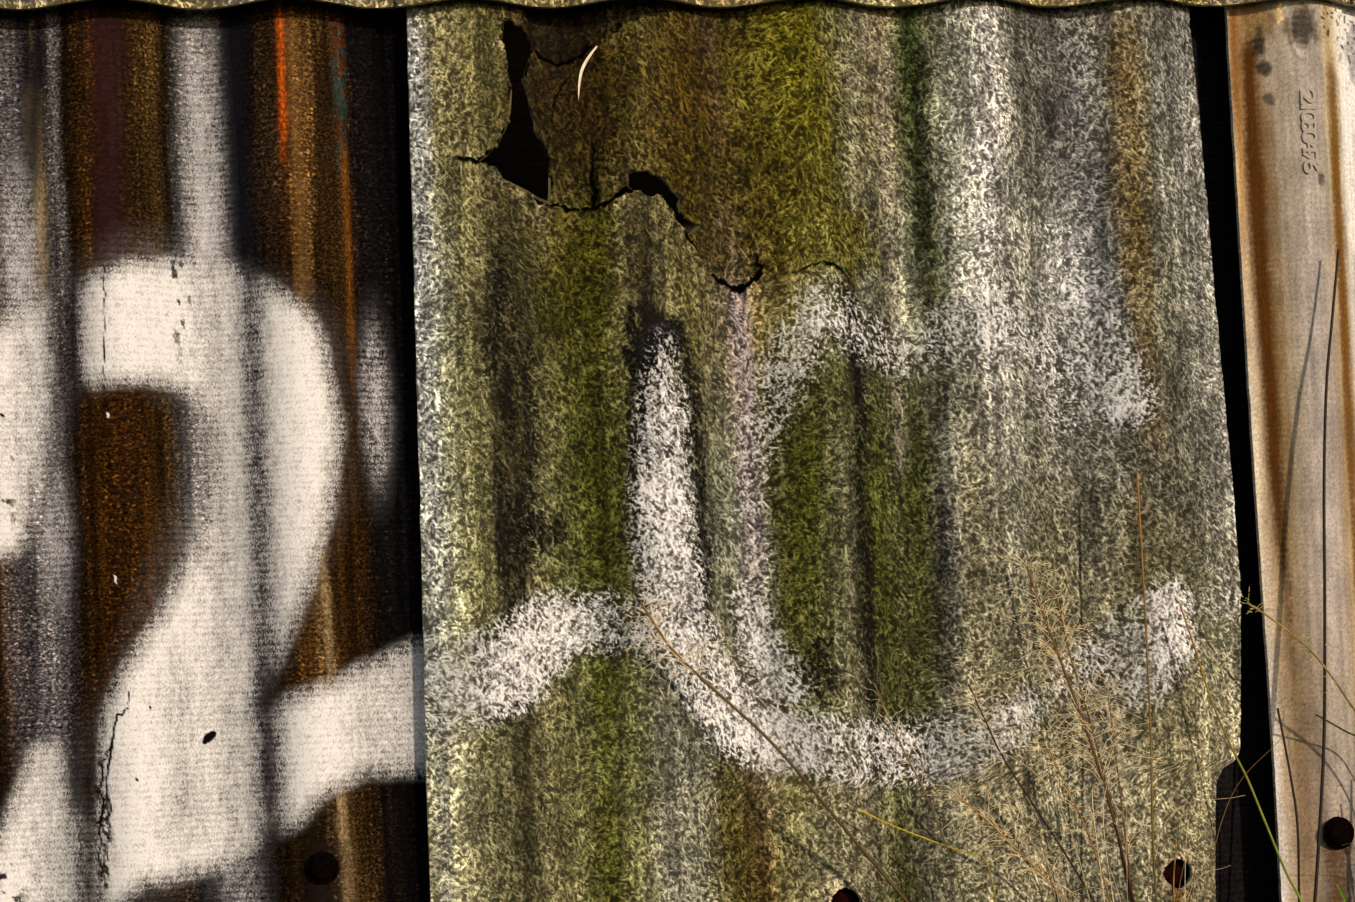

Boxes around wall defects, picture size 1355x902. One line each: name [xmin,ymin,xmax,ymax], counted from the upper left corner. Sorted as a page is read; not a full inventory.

corrosion [277,0,307,320]
leakage [408,44,441,587]
crack [446,155,480,163]
spalling [494,157,552,211]
leakage [484,240,568,592]
crack [535,43,596,66]
spalling [479,4,665,161]
crack [549,142,633,212]
leakage [566,301,712,660]
leakage [848,288,958,699]
corrosion [1229,12,1291,588]
corrosion [1326,65,1355,536]